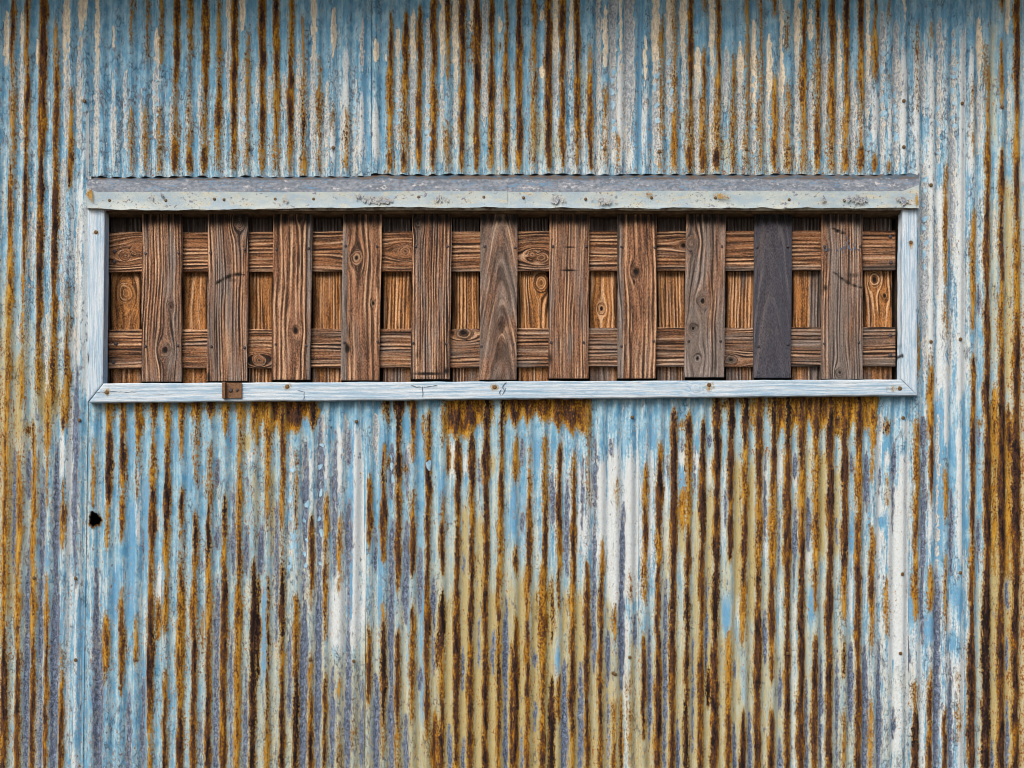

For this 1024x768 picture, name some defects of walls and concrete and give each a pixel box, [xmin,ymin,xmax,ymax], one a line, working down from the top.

corrosion [126,0,353,176]
corrosion [383,0,624,173]
corrosion [655,0,893,174]
corrosion [0,0,75,768]
corrosion [908,0,1022,768]
corrosion [90,385,891,768]